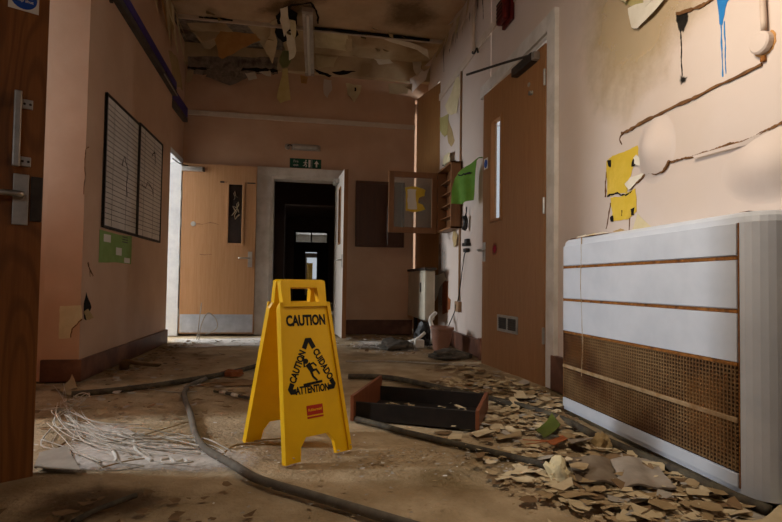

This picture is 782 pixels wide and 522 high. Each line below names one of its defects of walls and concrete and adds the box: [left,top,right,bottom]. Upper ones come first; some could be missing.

spalling [275,9,299,42]
peeling [622,0,663,29]
crack [676,0,713,15]
flaking render [186,56,278,85]
crack [619,63,763,145]
crack [670,121,782,163]
peeling [587,145,651,236]